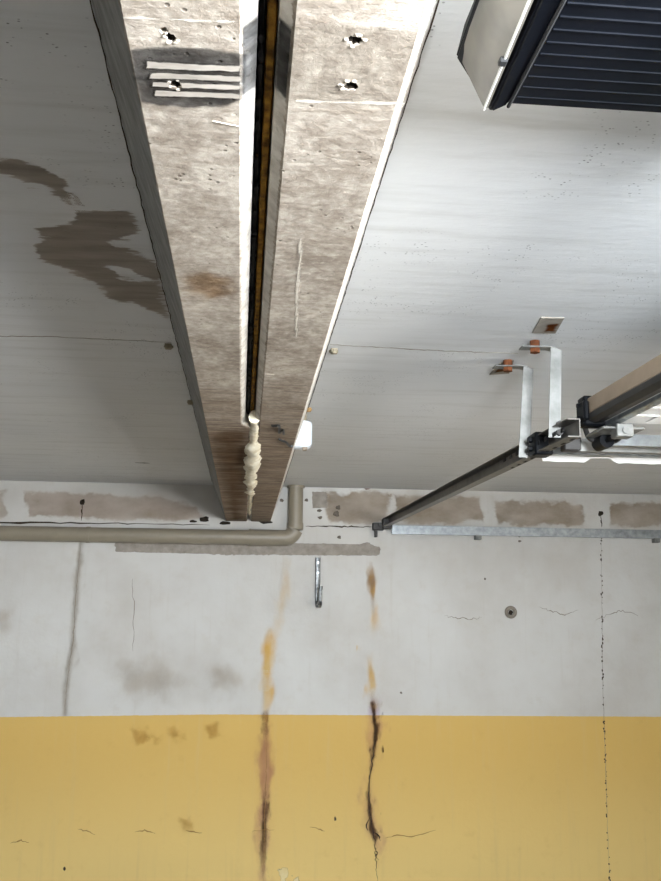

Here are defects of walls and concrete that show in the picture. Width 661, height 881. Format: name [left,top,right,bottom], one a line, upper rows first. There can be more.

peeling [312,492,327,508]
crack [598,538,638,881]
rust [252,731,268,864]